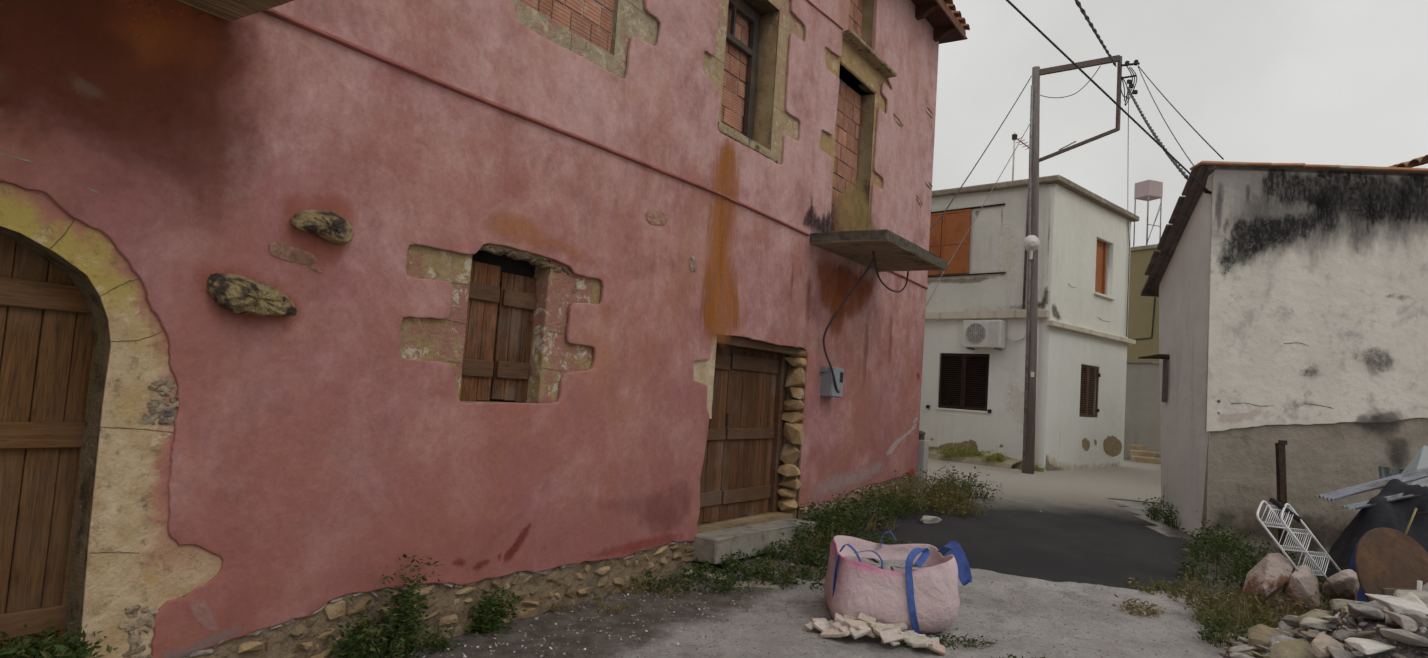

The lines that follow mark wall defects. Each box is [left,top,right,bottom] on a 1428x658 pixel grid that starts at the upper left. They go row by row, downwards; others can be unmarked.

rust [705,146,738,337]
water stain [1217,168,1428,274]
rust [818,265,872,333]
water stain [1365,350,1392,370]
spalling [142,378,179,425]